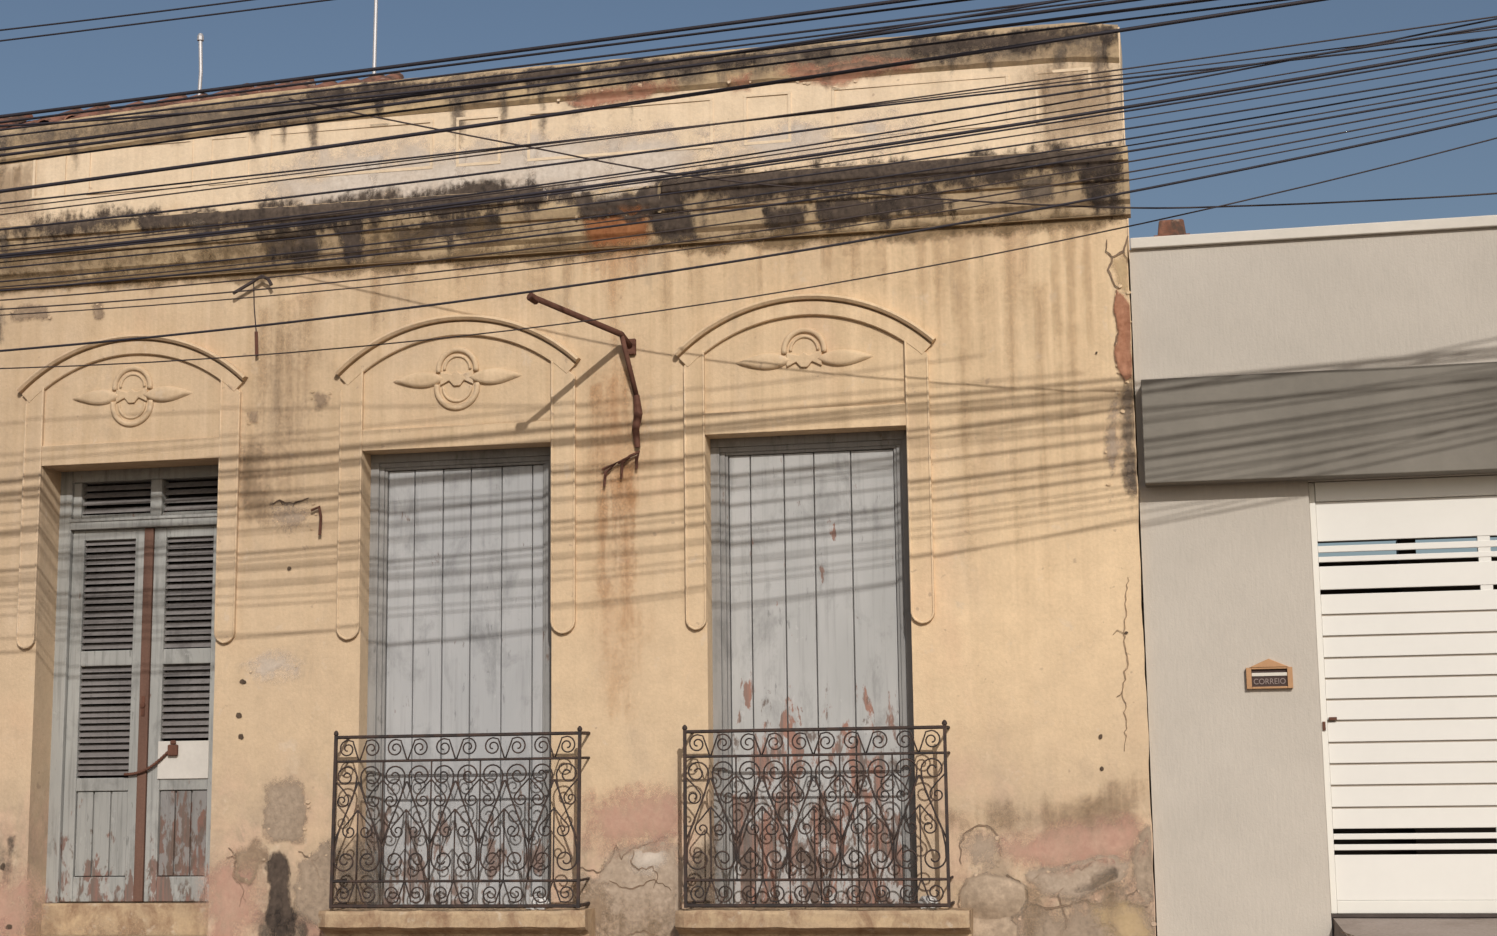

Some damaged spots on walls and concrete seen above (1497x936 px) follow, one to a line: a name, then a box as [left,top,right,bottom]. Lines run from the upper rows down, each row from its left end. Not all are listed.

water stain [0,25,1119,152]
water stain [0,143,1126,294]
flaking render [1095,258,1132,486]
water stain [1122,386,1137,494]
crack [1116,579,1129,751]
water stain [261,852,308,936]
flaking render [569,790,691,936]
peeling [959,816,1157,936]